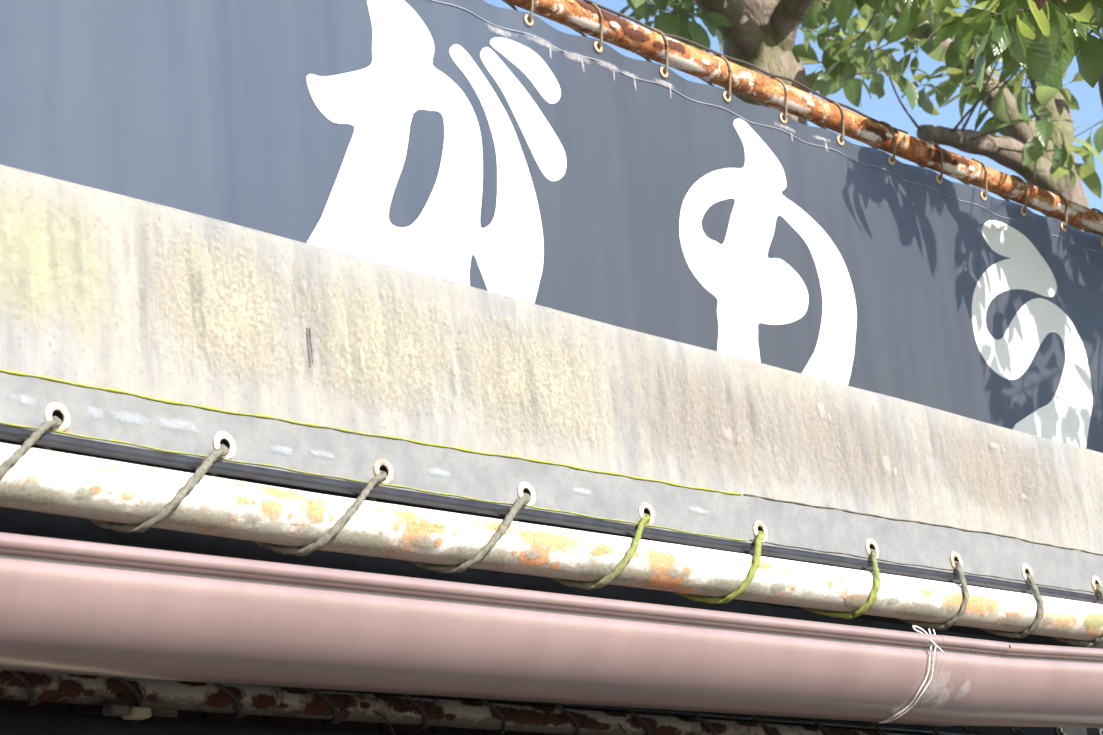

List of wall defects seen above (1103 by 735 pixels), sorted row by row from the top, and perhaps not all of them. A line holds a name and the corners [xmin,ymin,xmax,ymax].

corrosion [90,485,144,501]
corrosion [235,483,334,522]
corrosion [376,508,458,546]
corrosion [474,520,695,594]
corrosion [921,589,1026,619]
corrosion [1044,610,1077,626]
corrosion [0,670,157,704]